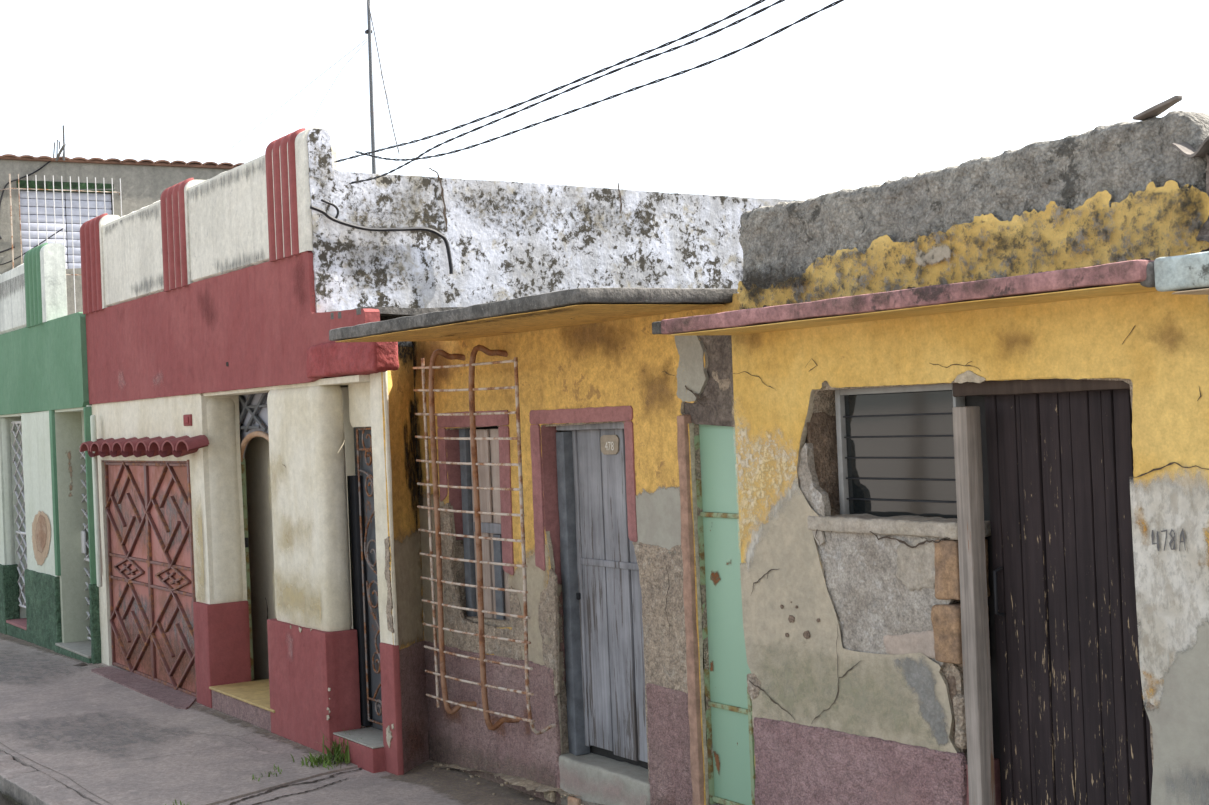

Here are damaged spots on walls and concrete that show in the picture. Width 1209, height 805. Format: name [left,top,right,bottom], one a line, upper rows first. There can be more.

leakage [341,182,434,295]
leakage [461,188,649,232]
peeling [735,180,1209,309]
leakage [1196,216,1209,243]
flaking render [675,335,735,427]
peeling [636,486,681,554]
peeling [740,443,967,753]
peeling [1130,473,1209,805]